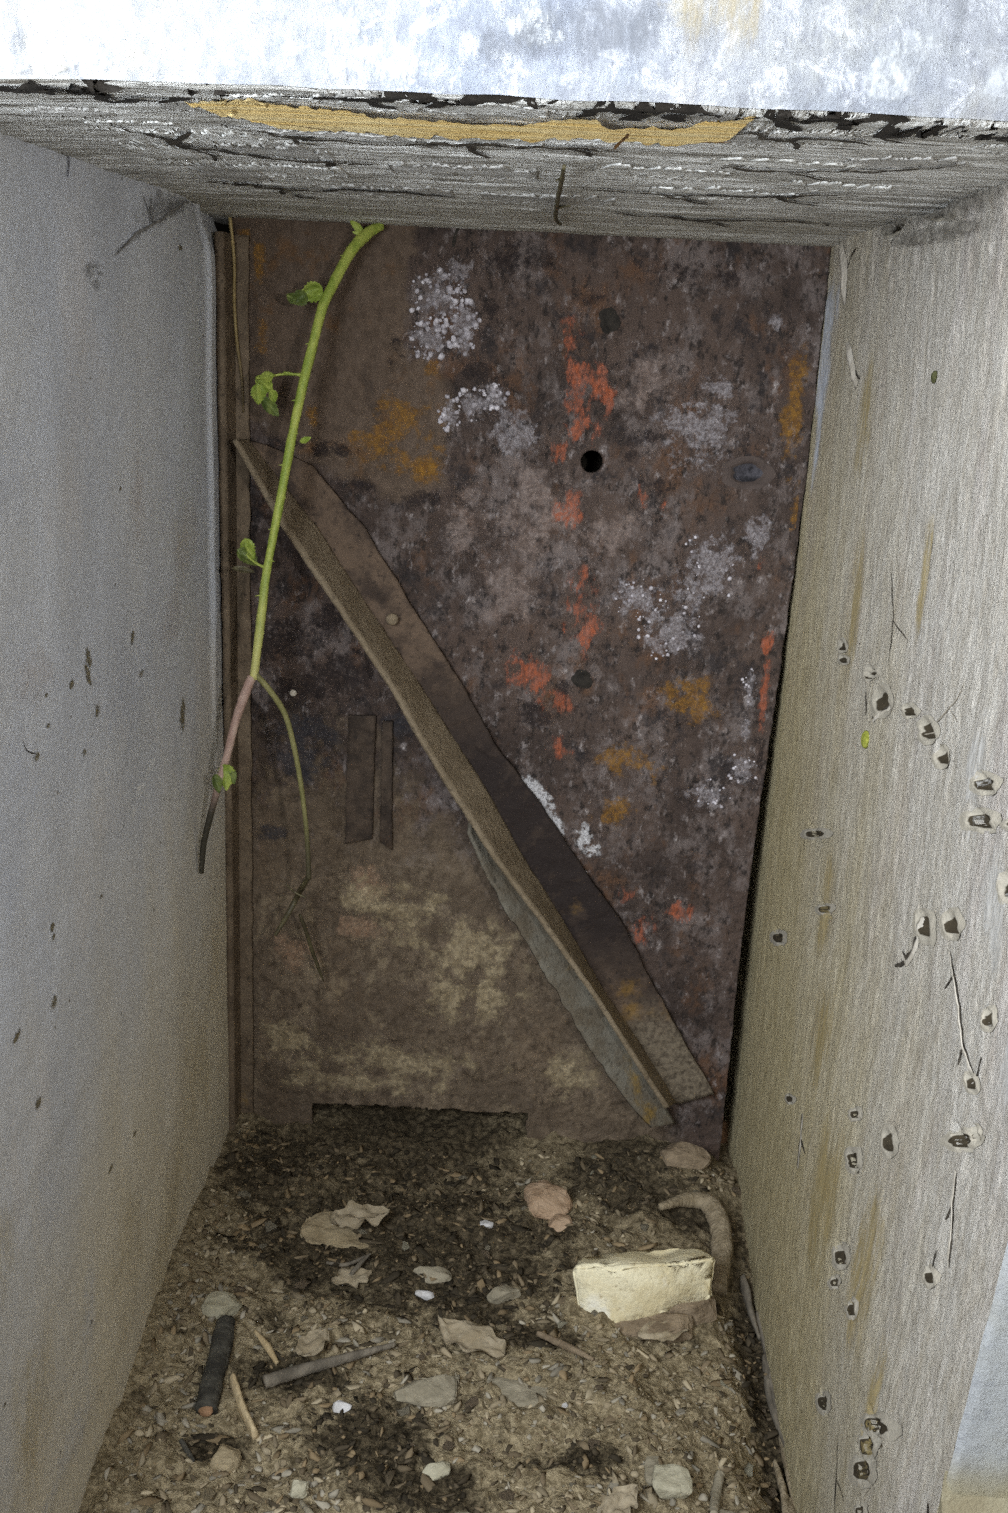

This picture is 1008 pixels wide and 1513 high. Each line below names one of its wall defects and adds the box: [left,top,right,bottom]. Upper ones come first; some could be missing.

peeling [507,0,562,44]
peeling [29,89,669,207]
peeling [594,28,1008,202]
spalling [877,183,1008,247]
corrosion [295,402,442,505]
corrosion [252,603,373,698]